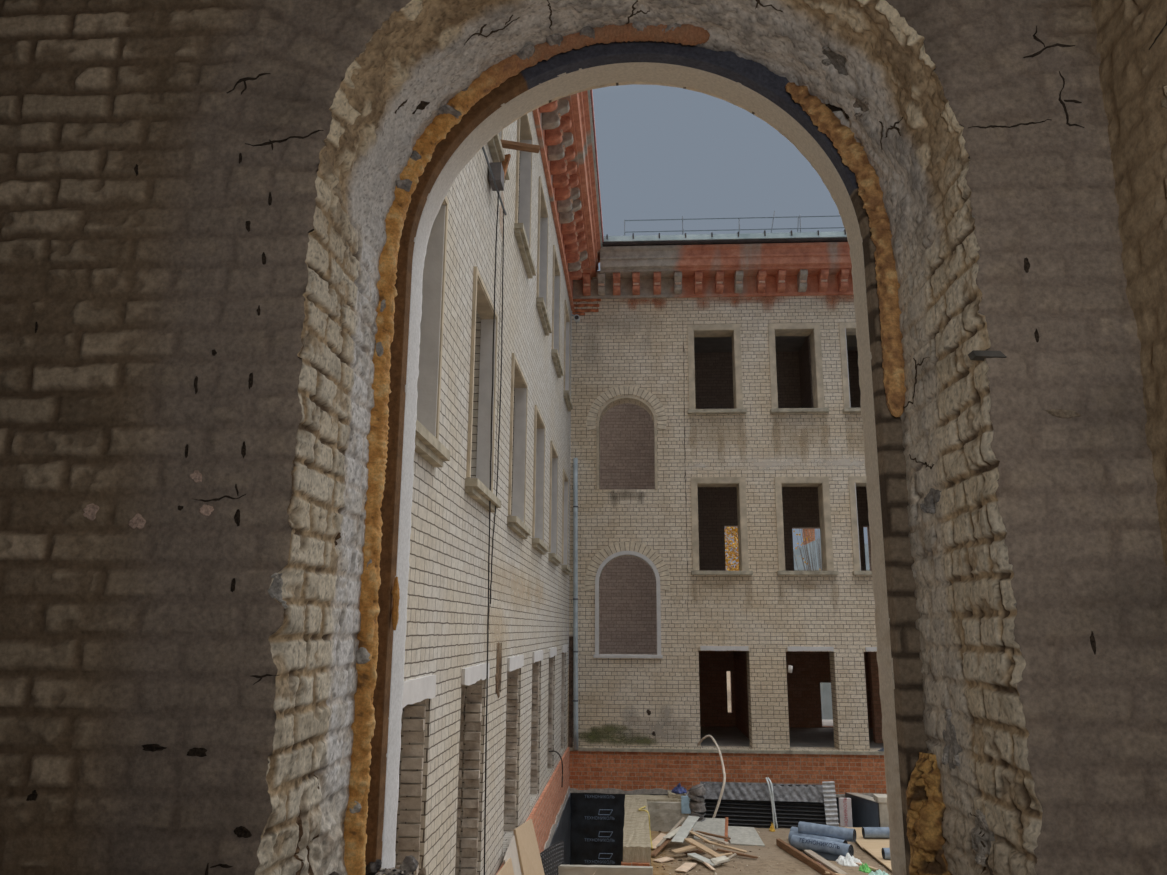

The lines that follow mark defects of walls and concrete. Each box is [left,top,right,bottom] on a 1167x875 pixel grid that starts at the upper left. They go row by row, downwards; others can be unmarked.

crack [626,0,650,24]
crack [755,0,783,12]
crack [464,15,520,45]
crack [1149,22,1167,50]
spalling [822,46,849,76]
crack [227,73,271,95]
crack [969,26,1084,129]
crack [245,130,324,150]
crack [205,863,233,875]